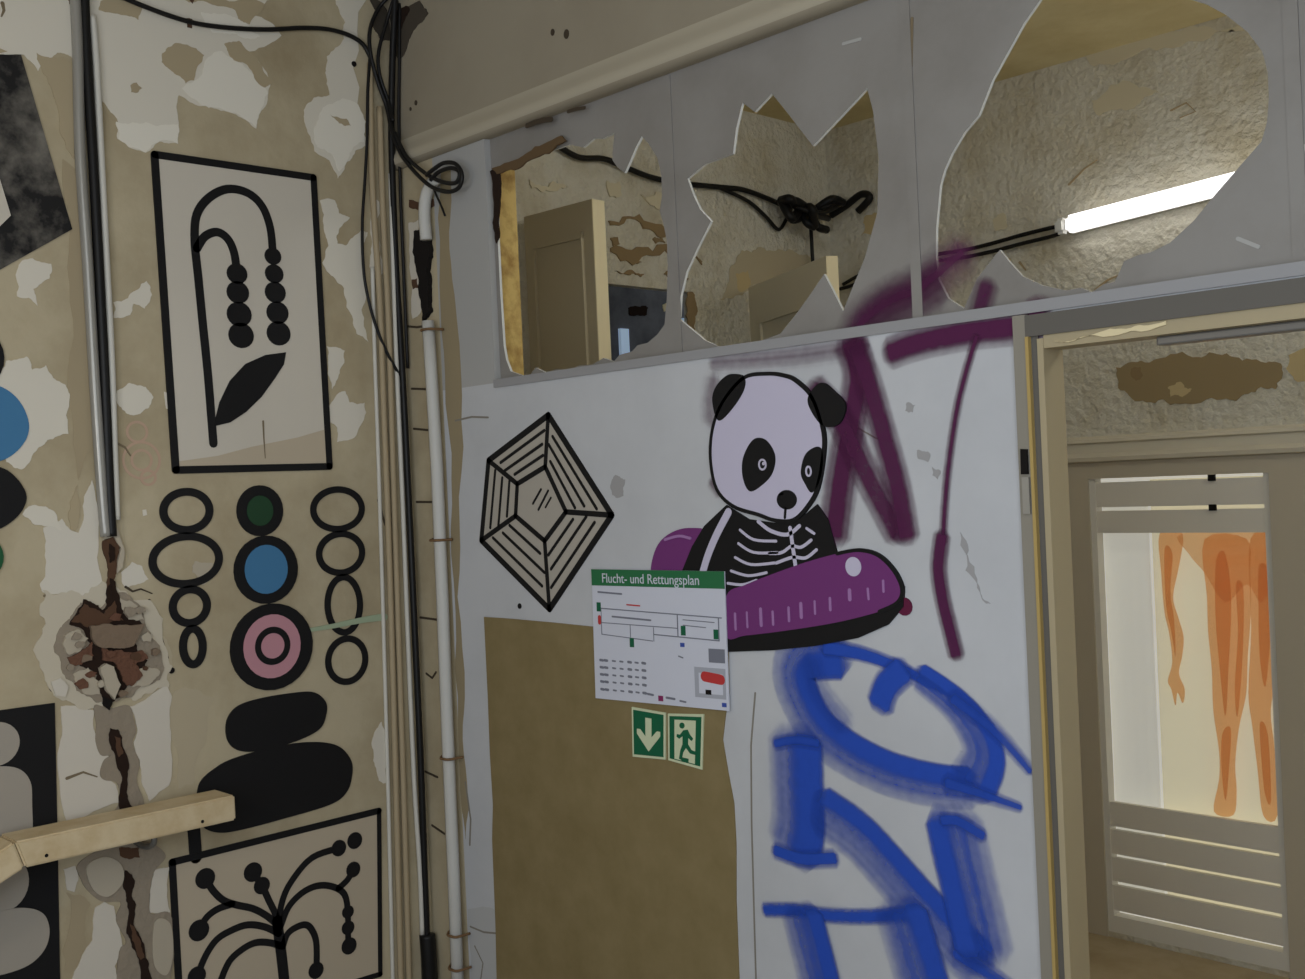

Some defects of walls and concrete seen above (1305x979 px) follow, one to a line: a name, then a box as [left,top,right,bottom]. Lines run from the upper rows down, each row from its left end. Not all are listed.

peeling [99,0,142,19]
peeling [162,0,273,127]
peeling [116,122,179,153]
peeling [314,98,366,171]
peeling [525,106,586,128]
peeling [490,136,567,243]
peeling [608,192,667,277]
peeling [720,247,811,300]
spalling [685,278,698,330]
peeling [1057,321,1167,342]
crack [124,586,153,600]
spalling [33,537,173,710]